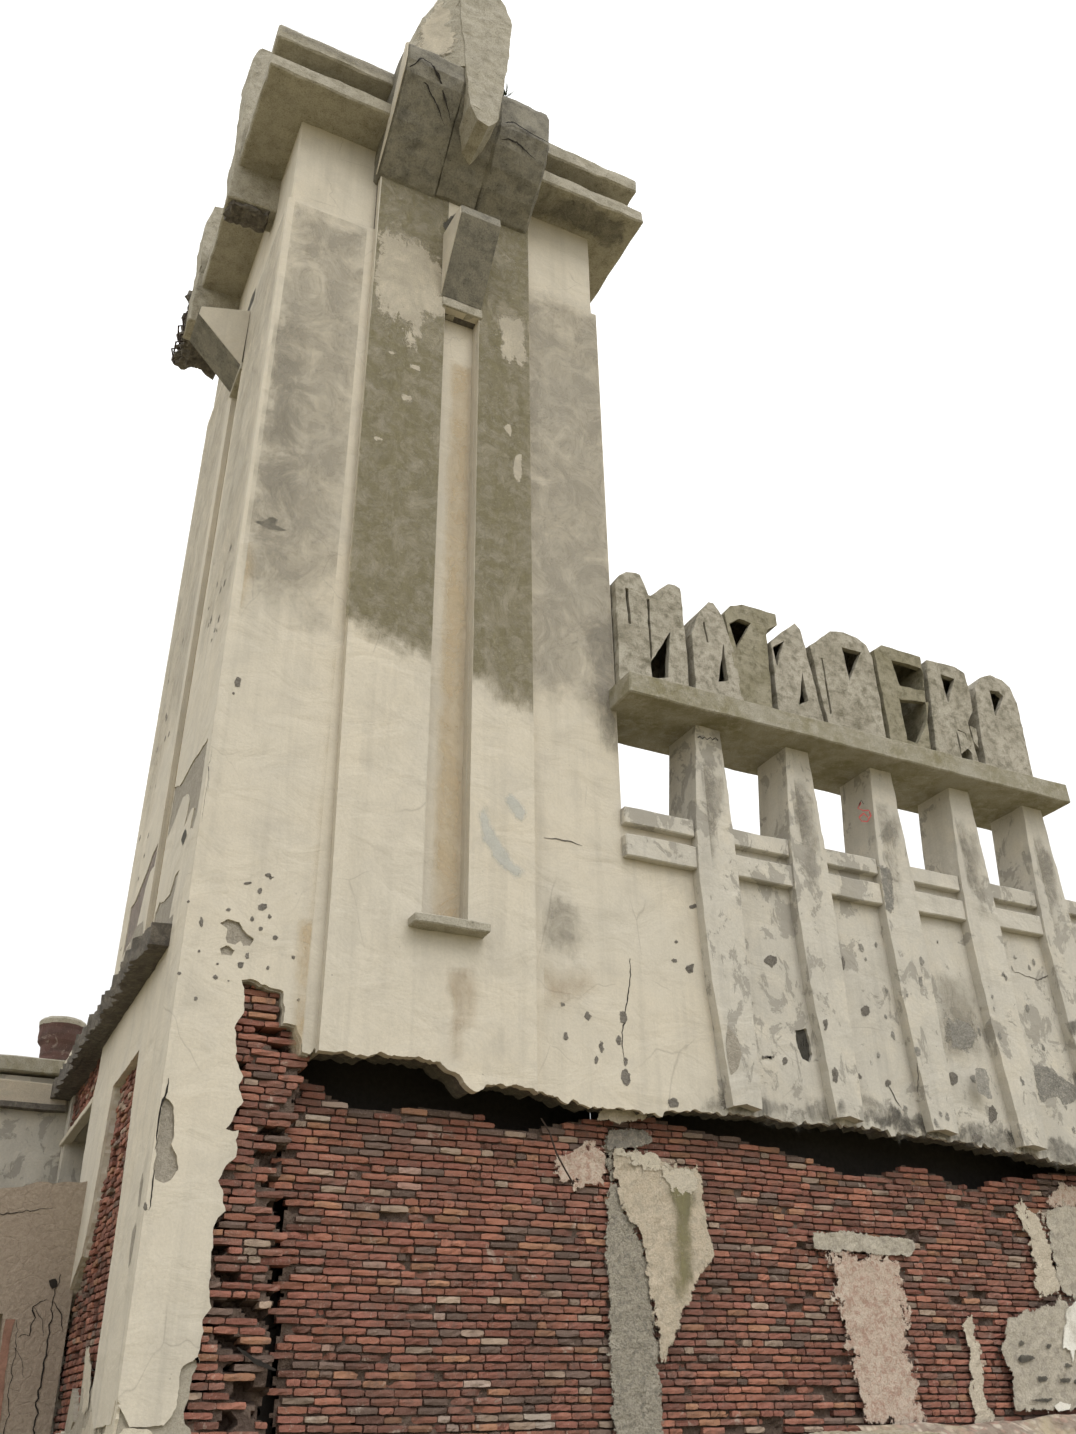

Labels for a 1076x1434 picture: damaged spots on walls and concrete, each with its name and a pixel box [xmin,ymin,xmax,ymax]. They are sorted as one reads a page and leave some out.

spalling [171,290,216,380]
damp [263,222,359,583]
damp [529,304,613,673]
peeling [120,743,207,965]
peeling [878,865,894,913]
crack [3,1274,63,1434]
flaking render [53,1058,152,1434]
spalling [138,1099,177,1211]
flaking render [184,873,1076,1434]